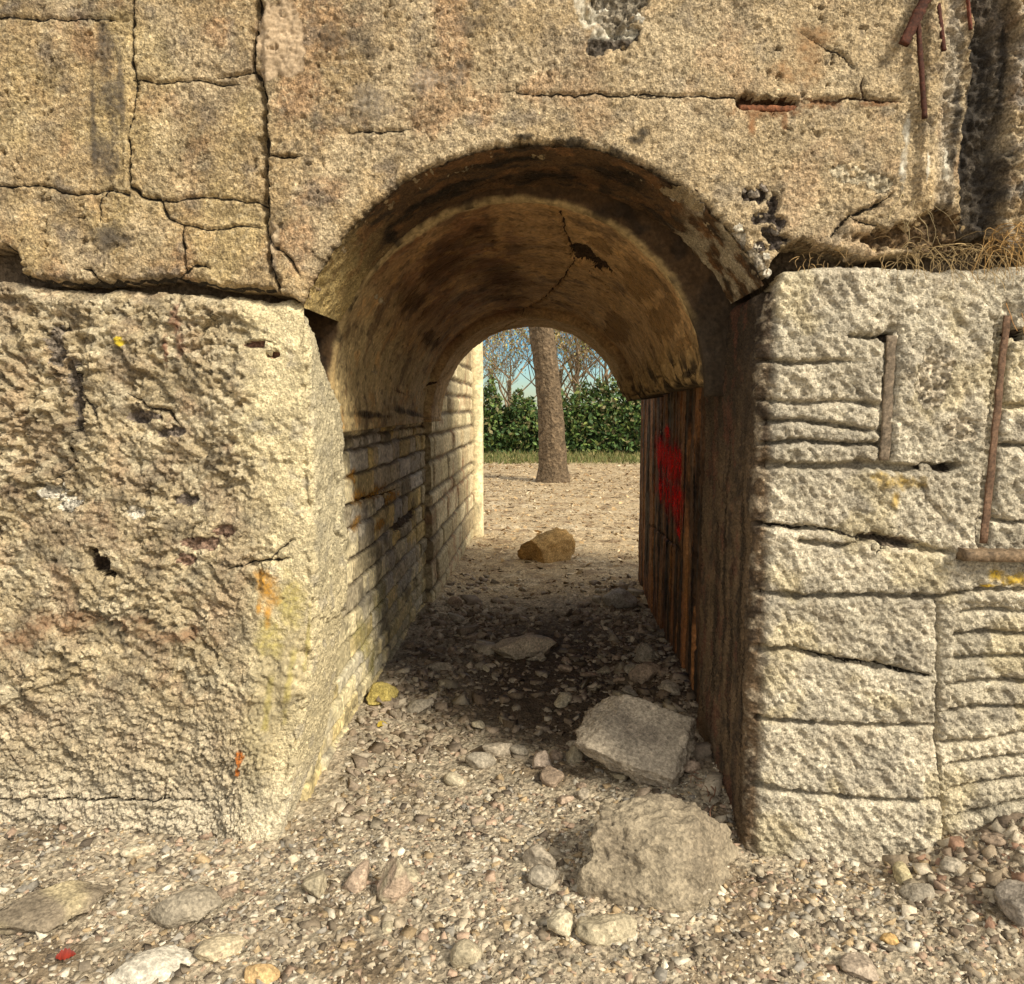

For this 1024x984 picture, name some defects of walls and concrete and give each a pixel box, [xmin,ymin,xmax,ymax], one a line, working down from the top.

spalling [583,0,648,57]
rust [898,0,947,119]
crack [0,0,300,293]
damp [944,31,1015,233]
crack [521,210,615,317]
spalling [731,183,850,279]
crack [830,198,887,237]
spalling [84,547,117,587]
crack [229,540,292,569]